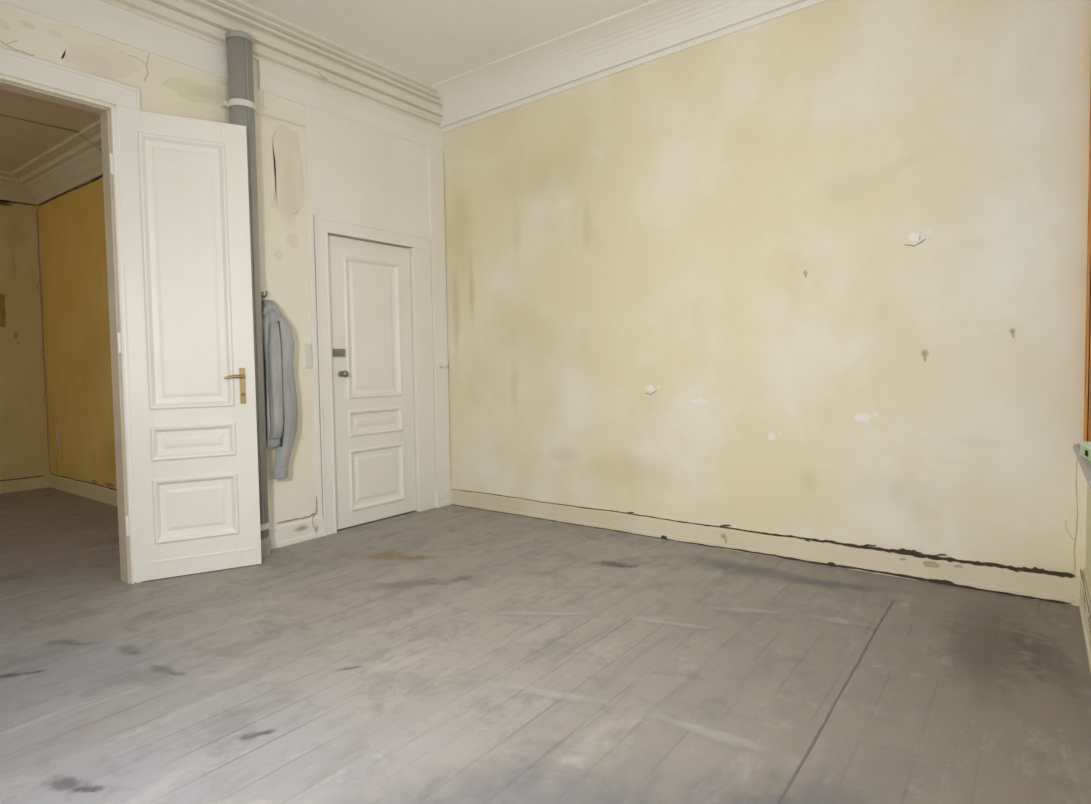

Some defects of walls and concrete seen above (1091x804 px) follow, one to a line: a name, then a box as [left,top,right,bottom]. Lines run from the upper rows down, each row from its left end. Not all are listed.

peeling [0,294,19,344]